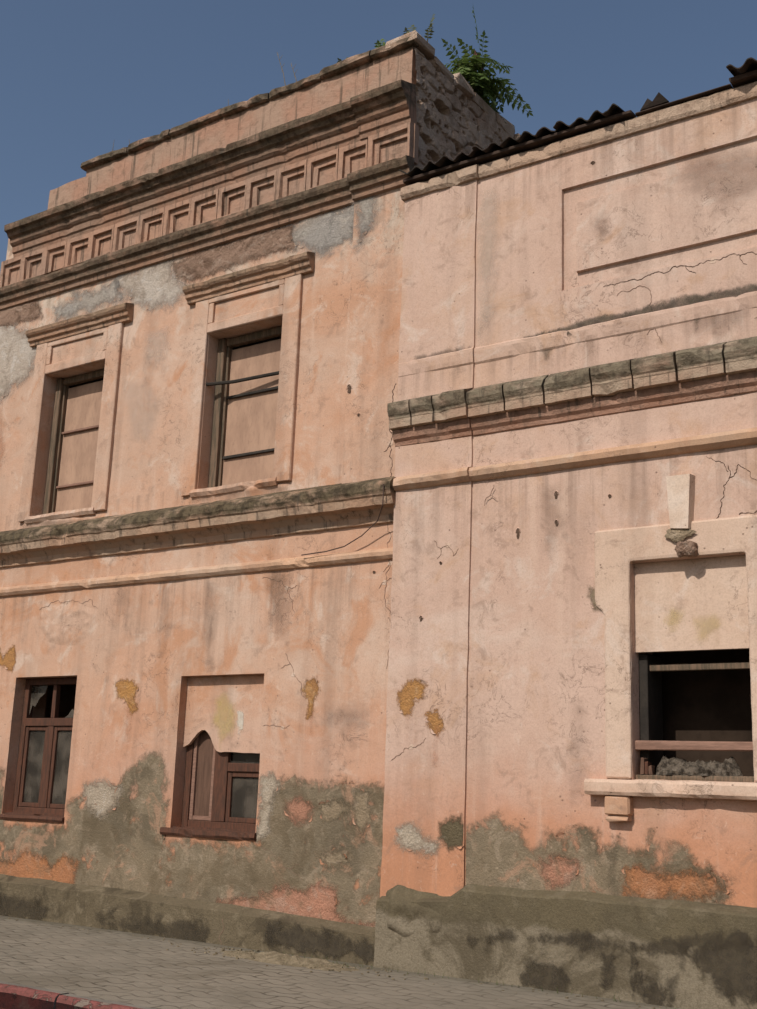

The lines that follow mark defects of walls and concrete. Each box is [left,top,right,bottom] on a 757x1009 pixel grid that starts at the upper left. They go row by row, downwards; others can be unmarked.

spalling [54,196,376,322]
crack [603,252,756,342]
spalling [0,301,41,398]
crack [706,456,757,519]
peeling [0,751,385,927]
peeling [439,815,730,904]
damp [520,961,569,993]
damp [528,930,757,1007]